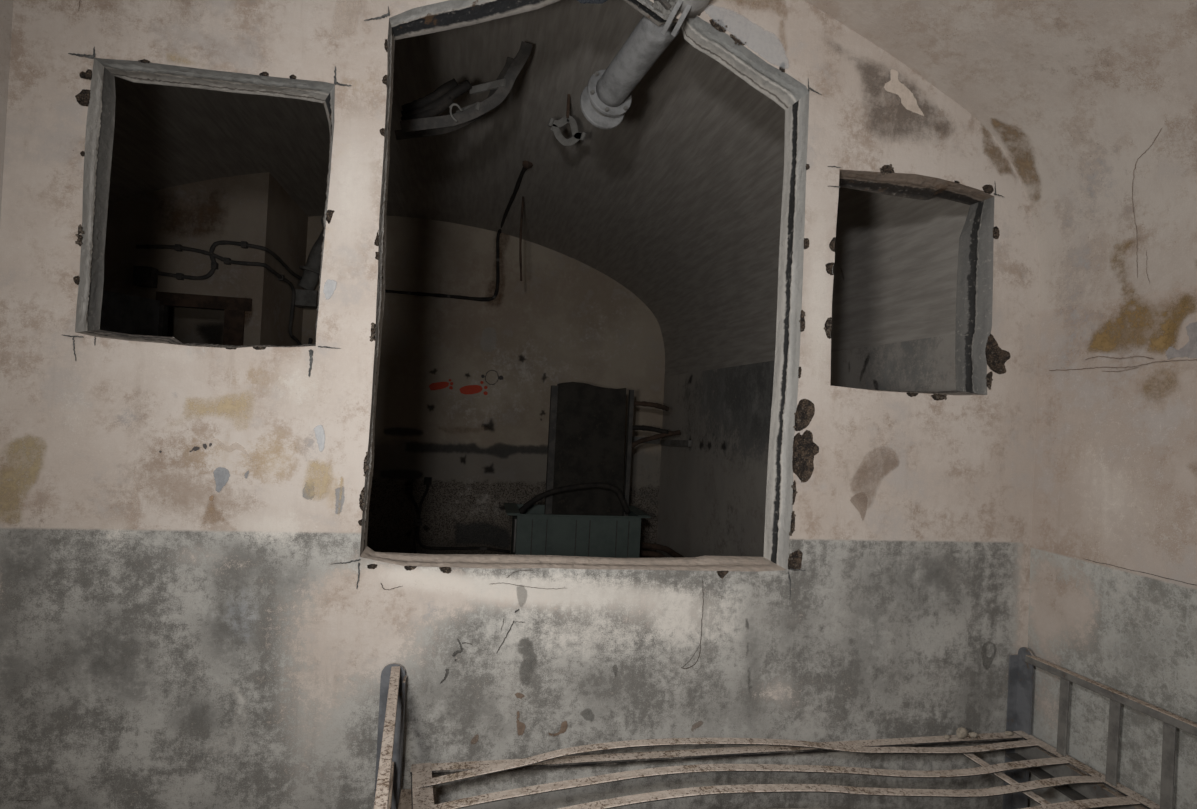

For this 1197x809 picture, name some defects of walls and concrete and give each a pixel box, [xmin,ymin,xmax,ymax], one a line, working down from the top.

peeling [884,69,924,116]
crack [1049,356,1197,372]
spalling [789,399,819,536]
spalling [788,549,803,571]